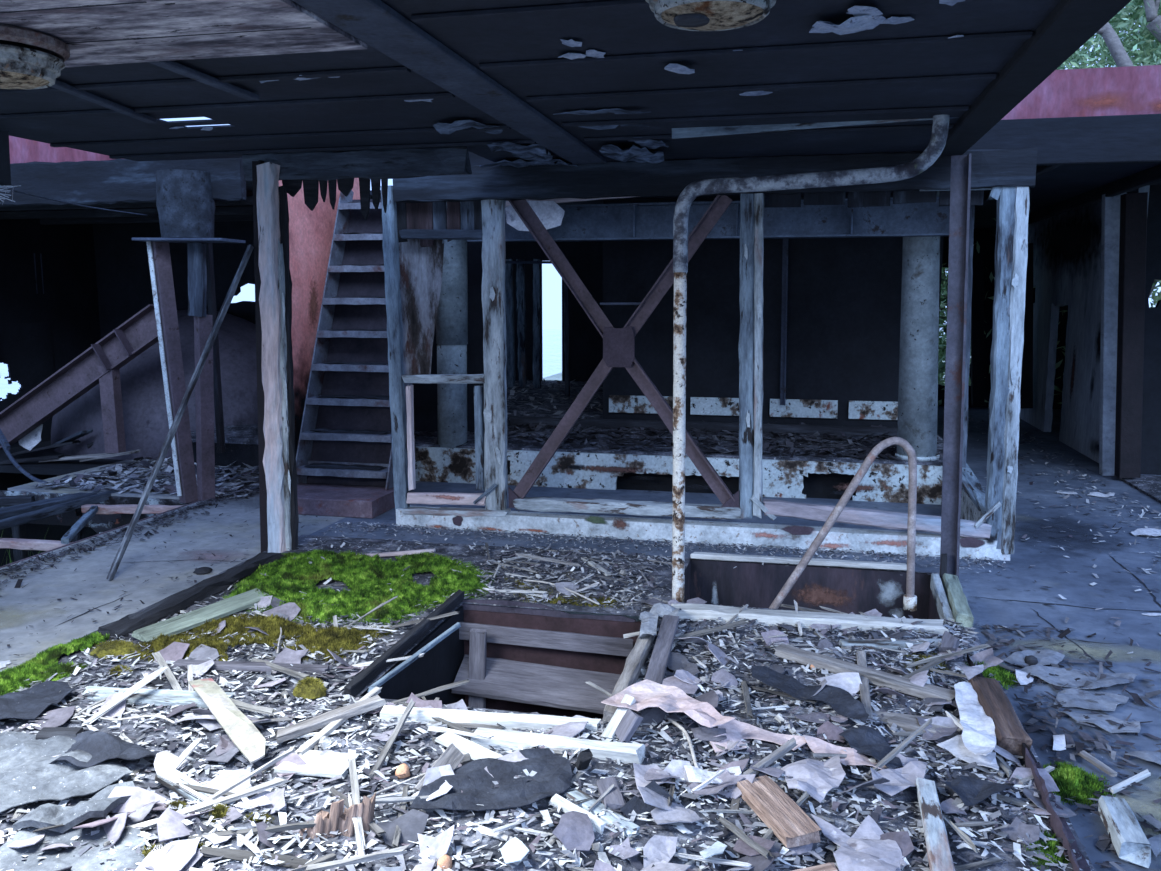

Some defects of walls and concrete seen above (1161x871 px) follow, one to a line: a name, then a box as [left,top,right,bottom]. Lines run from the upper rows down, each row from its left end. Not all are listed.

peeling [809,6,915,35]
peeling [558,39,605,60]
peeling [664,63,695,74]
rust [569,465,651,480]
rust [432,516,463,529]
crack [970,555,1161,673]